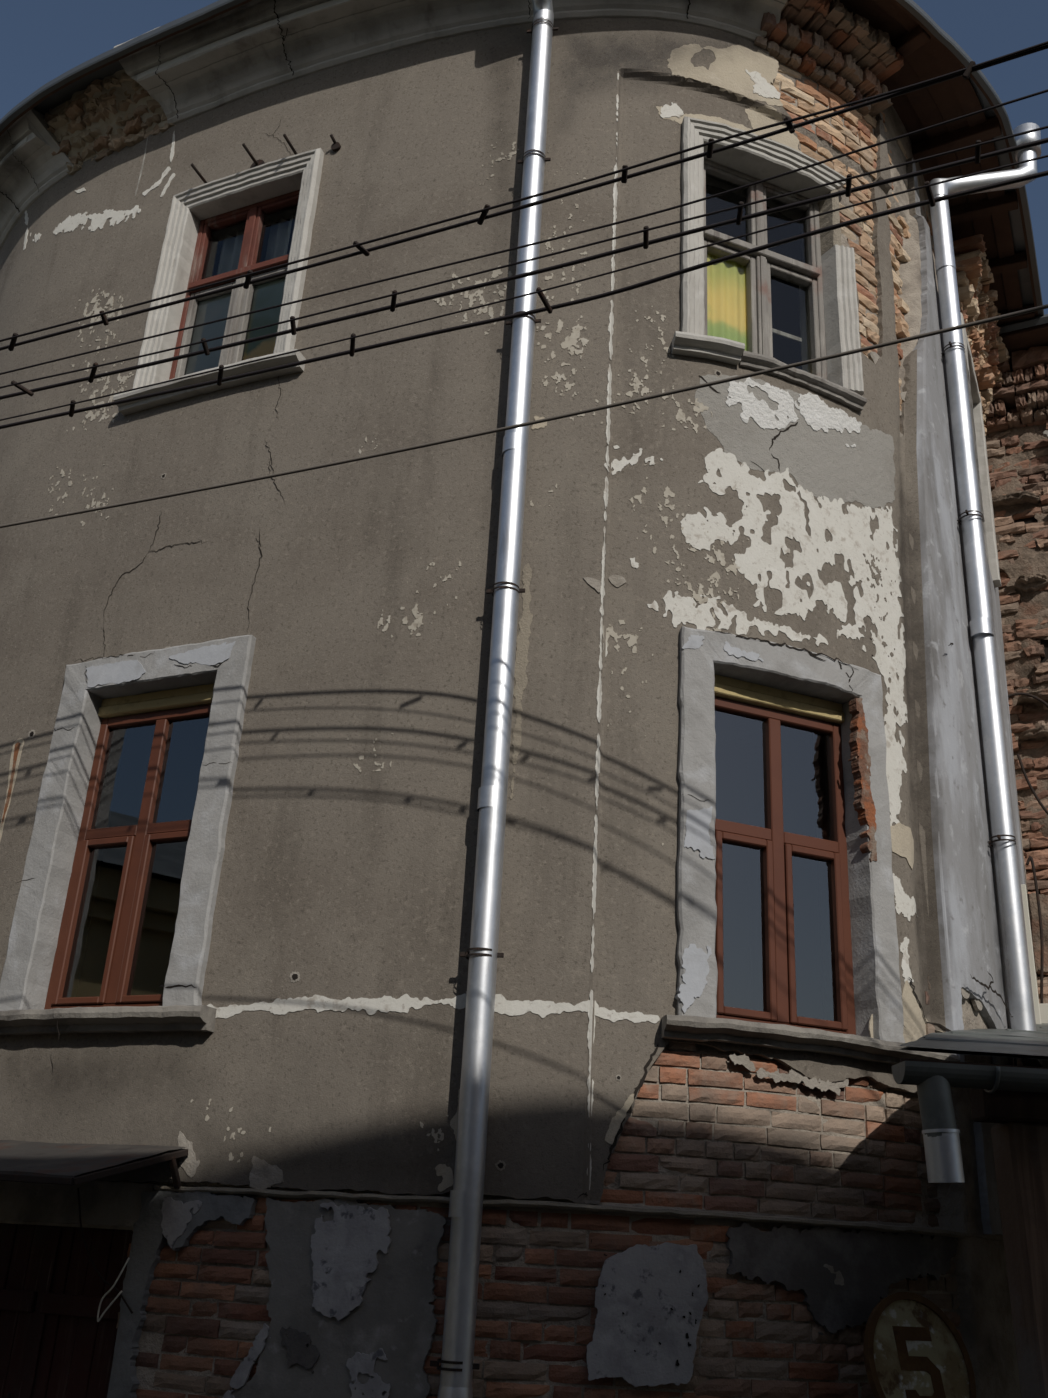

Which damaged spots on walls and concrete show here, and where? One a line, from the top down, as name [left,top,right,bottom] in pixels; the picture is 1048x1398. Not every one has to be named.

peeling [30,166,175,242]
crack [265,376,284,500]
crack [74,516,221,682]
crack [247,532,262,628]
peeling [532,44,943,1043]
flaking render [510,563,533,799]
rust [0,738,24,841]
peeling [494,990,660,1115]
flaking render [587,1042,941,1227]
peeling [310,1202,392,1321]
peeling [223,1323,271,1398]
peeling [346,1348,391,1398]